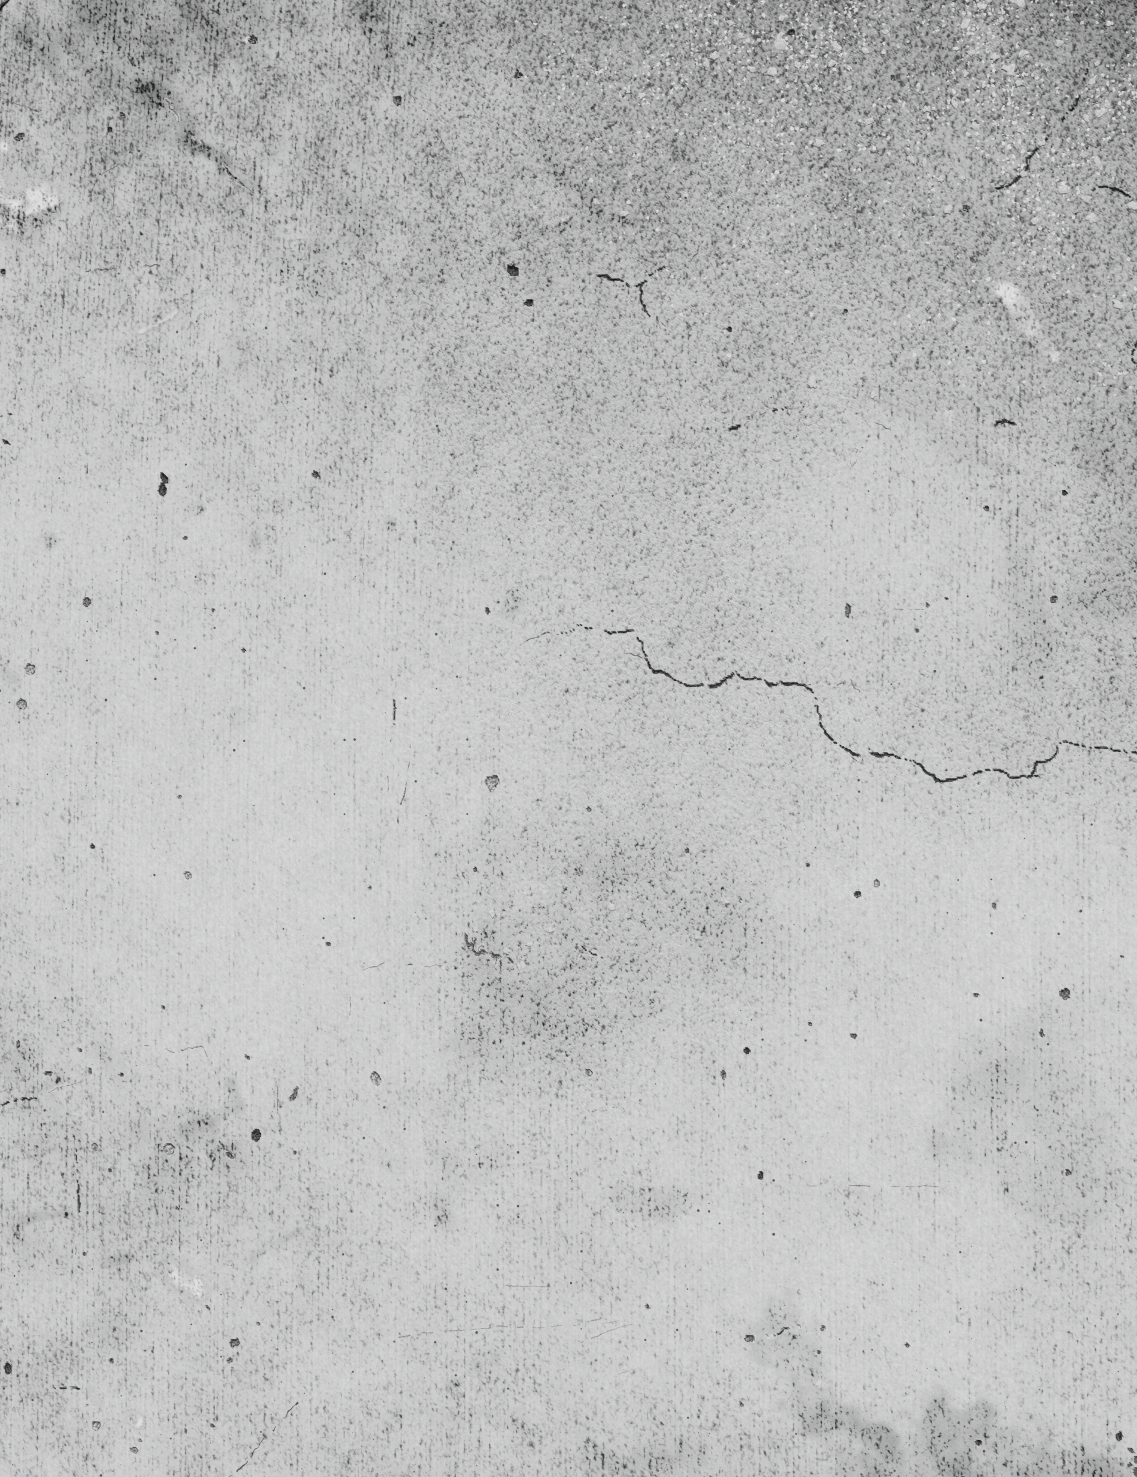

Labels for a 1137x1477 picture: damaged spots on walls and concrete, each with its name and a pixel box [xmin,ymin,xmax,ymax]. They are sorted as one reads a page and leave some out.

crack [598,247,699,327]
crack [526,625,1137,786]